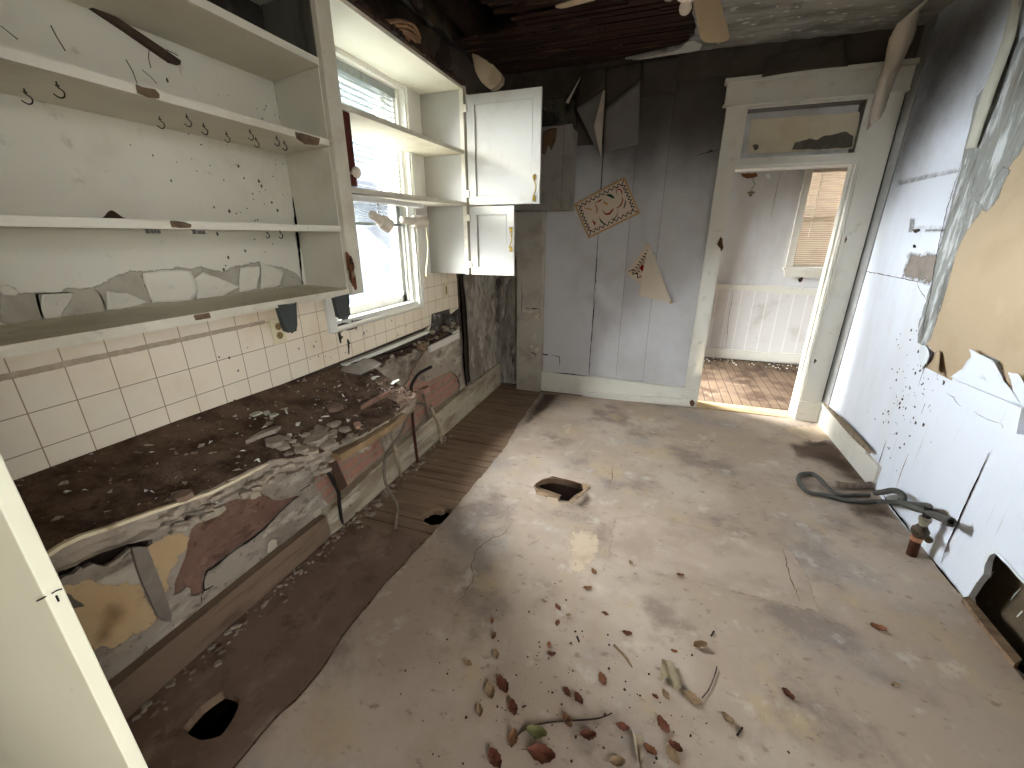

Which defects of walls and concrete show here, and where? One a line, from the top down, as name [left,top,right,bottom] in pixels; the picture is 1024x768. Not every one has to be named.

peeling [634,41,702,60]
peeling [748,112,860,153]
peeling [0,262,303,324]
damp [793,442,862,480]
crack [879,442,911,533]
spalling [147,486,296,595]
crack [929,453,989,593]
spalling [967,548,1024,599]
peeling [59,566,157,650]